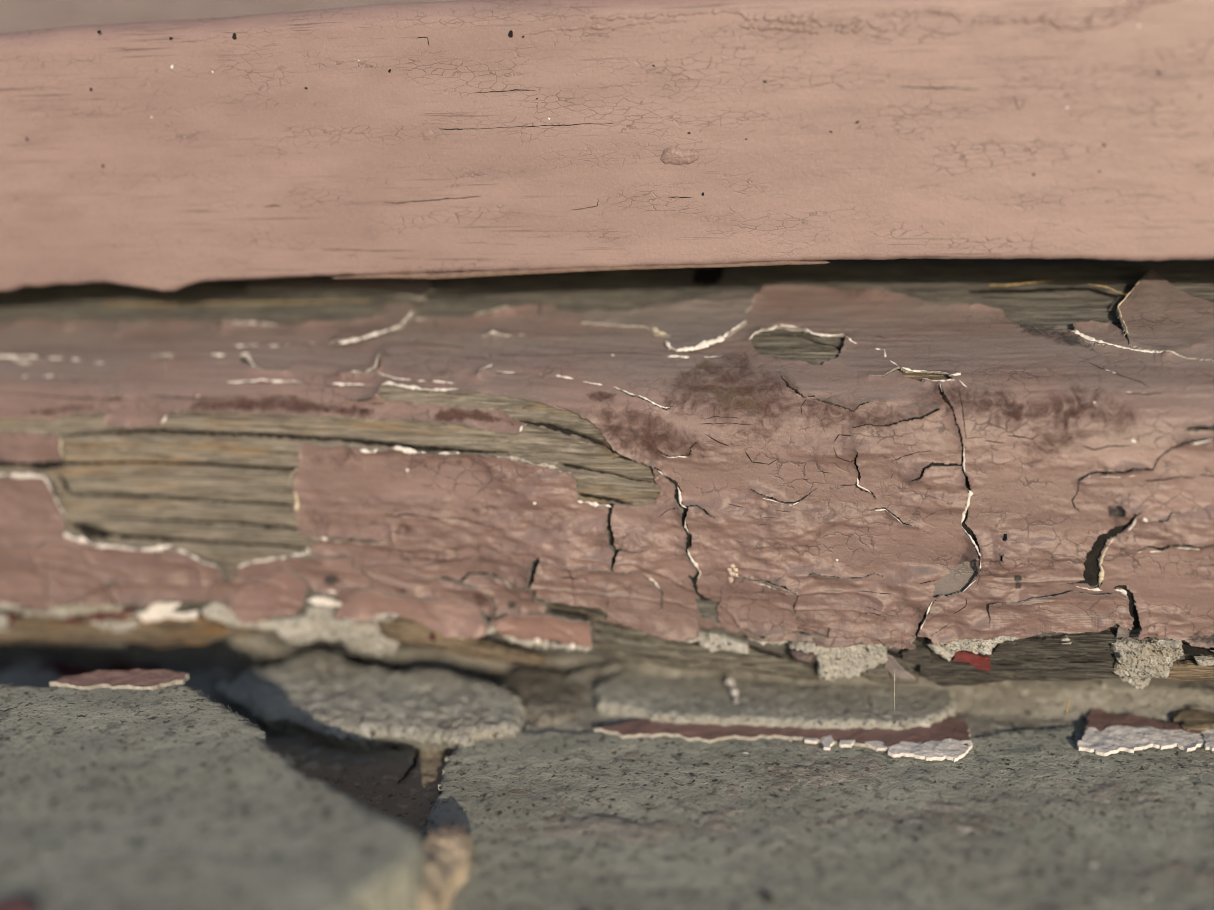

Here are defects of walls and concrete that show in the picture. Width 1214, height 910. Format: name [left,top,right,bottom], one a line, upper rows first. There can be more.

crack [482,303,671,411]
peeling [582,291,857,365]
crack [1072,330,1184,395]
peeling [1138,425,1214,470]
peeling [0,381,720,652]
crack [607,503,622,566]
crack [657,379,1040,601]
crack [1067,445,1214,631]
peeling [790,595,916,681]
crack [851,573,967,642]
peeling [953,651,991,671]
peeling [988,591,1132,638]